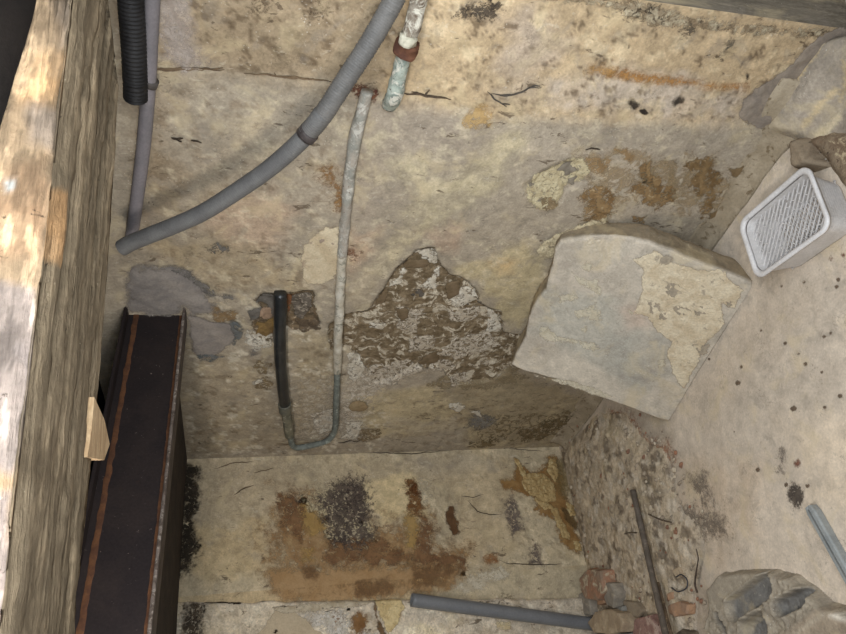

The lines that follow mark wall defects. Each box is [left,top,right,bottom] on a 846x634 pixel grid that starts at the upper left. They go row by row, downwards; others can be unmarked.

crack [157,65,224,73]
crack [244,73,331,82]
rust [589,67,739,89]
peeling [526,158,590,211]
spalling [247,293,274,342]
flaking render [286,247,520,387]
water stain [290,473,380,551]